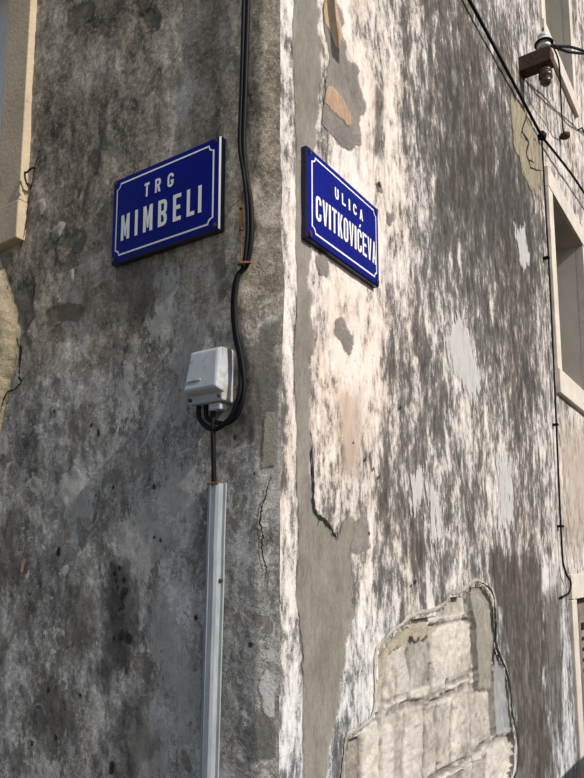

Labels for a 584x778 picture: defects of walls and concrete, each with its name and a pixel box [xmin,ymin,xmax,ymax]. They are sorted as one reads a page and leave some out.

water stain [513,221,530,271]
crack [0,337,30,413]
water stain [101,353,141,442]
water stain [144,261,205,435]
peeling [292,0,371,778]
water stain [438,311,481,406]
crack [254,475,271,581]
crack [310,430,340,539]
water stain [406,461,446,554]
water stain [496,452,514,531]
water stain [100,438,211,778]
spalling [341,578,517,778]